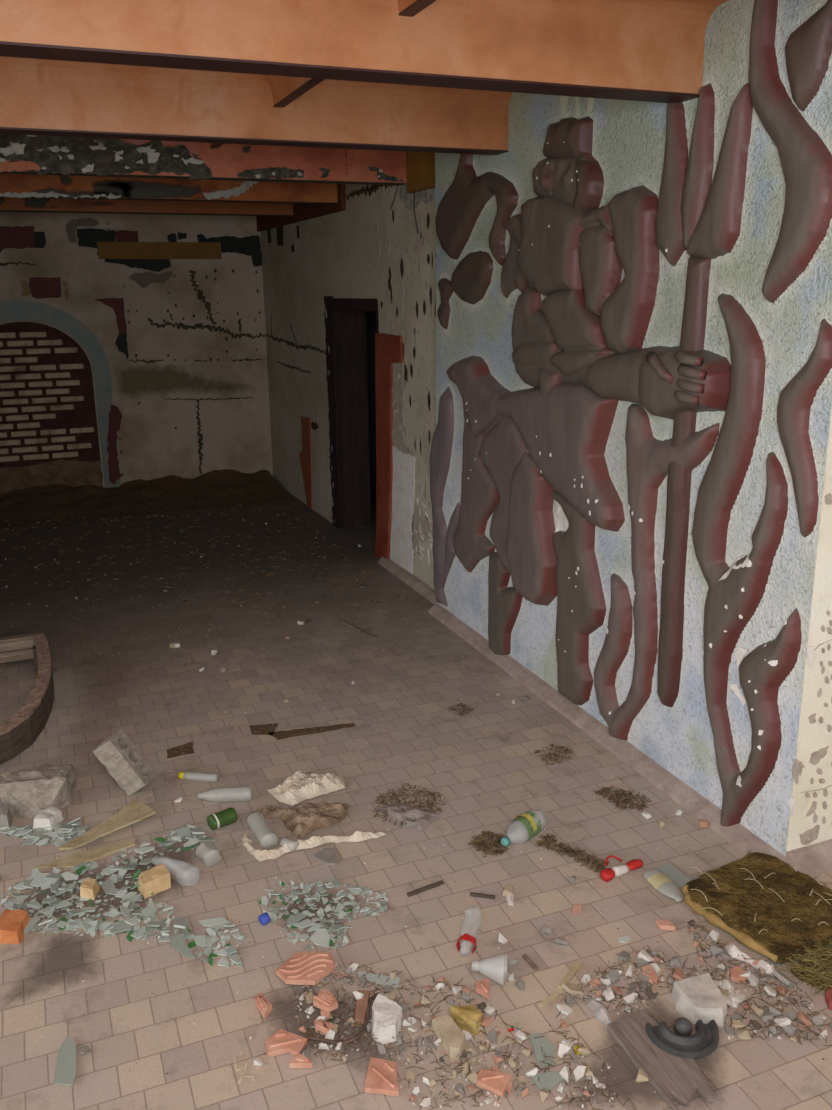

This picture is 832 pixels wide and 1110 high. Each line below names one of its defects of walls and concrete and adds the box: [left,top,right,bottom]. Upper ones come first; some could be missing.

peeling [0,160,41,173]
peeling [124,139,199,155]
crack [148,270,326,374]
crack [164,397,253,474]